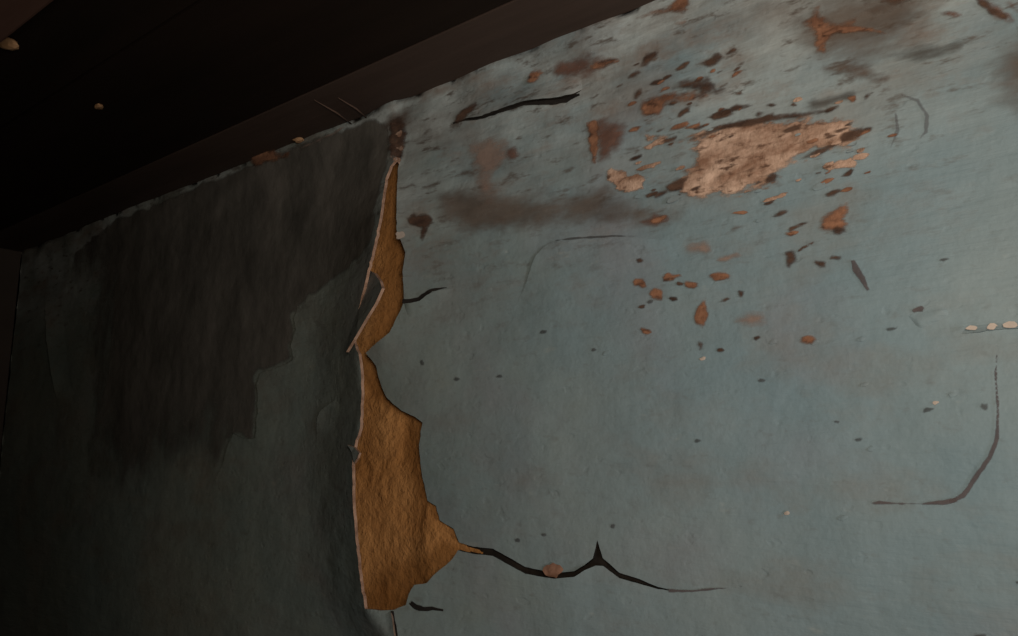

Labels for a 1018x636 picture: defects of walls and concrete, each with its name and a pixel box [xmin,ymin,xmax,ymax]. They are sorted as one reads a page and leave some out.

spalling [607,48,871,216]
spalling [822,206,848,234]
spalling [786,242,813,266]
crack [402,287,453,318]
spalling [634,273,697,308]
spalling [694,302,708,325]
spalling [710,273,729,281]
peeling [74,120,499,636]
crack [873,367,999,505]
crack [467,545,723,592]